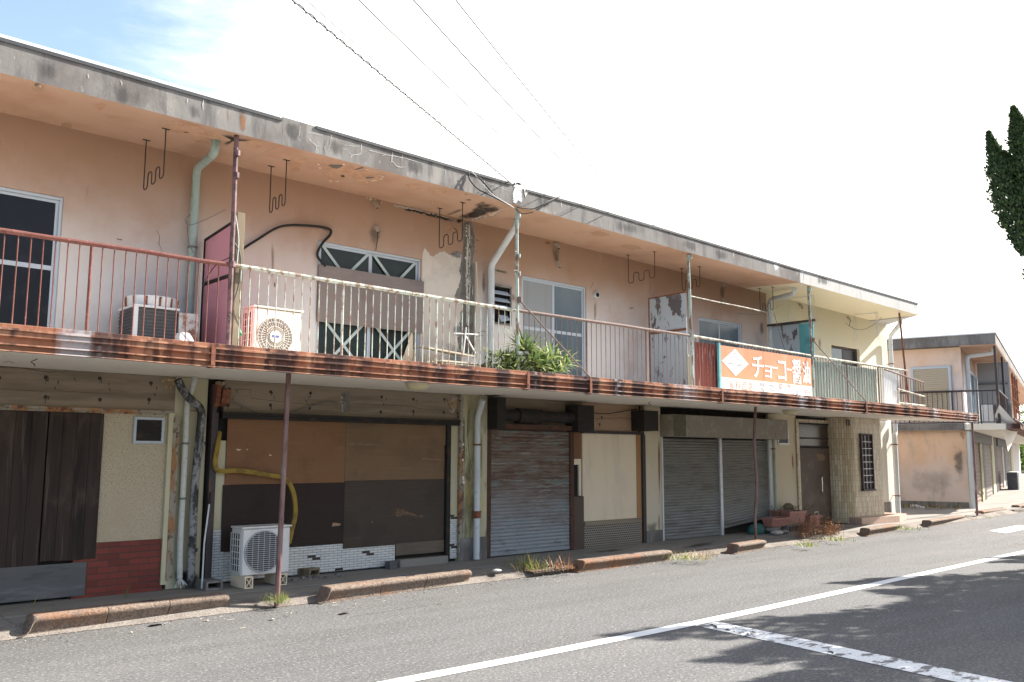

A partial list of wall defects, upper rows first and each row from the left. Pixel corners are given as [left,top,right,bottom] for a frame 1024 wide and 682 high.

damp [432,202,497,223]
peeling [421,222,475,362]